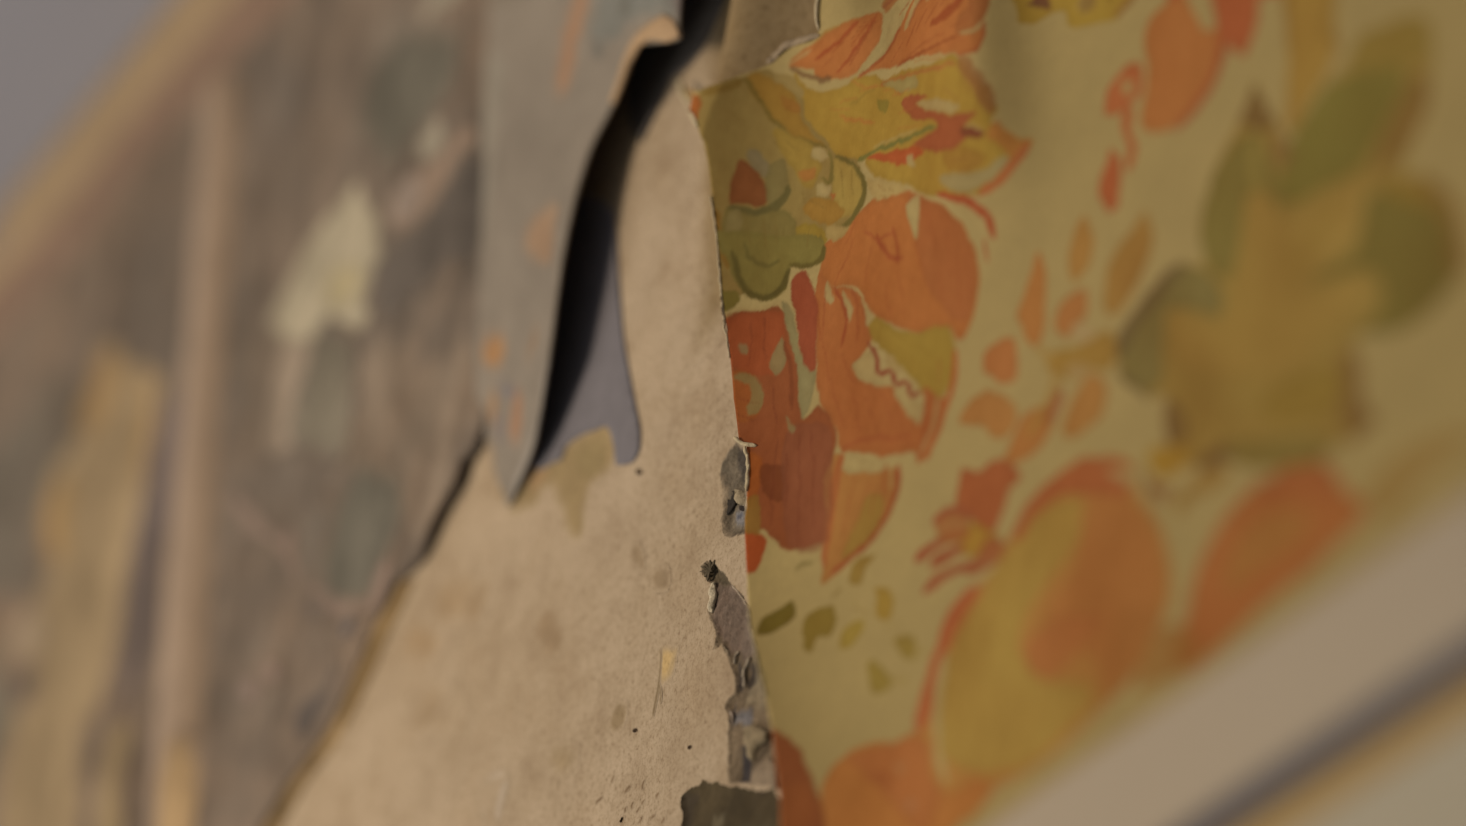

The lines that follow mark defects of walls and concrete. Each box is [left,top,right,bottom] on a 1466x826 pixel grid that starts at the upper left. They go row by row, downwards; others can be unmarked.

peeling [475,0,683,508]
peeling [263,333,312,462]
spalling [719,442,747,538]
spalling [680,560,780,826]